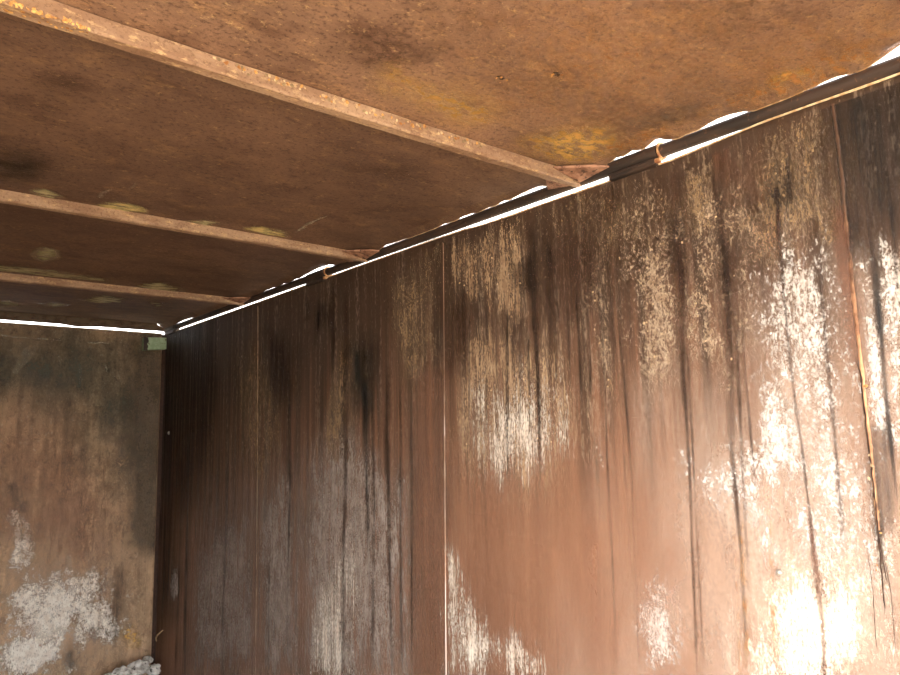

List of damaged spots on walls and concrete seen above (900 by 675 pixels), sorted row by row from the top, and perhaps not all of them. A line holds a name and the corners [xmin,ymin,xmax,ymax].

corrosion [529,126,666,162]
corrosion [699,45,885,115]
damp [831,90,900,249]
damp [0,329,412,672]
damp [515,244,541,452]
damp [668,202,900,675]